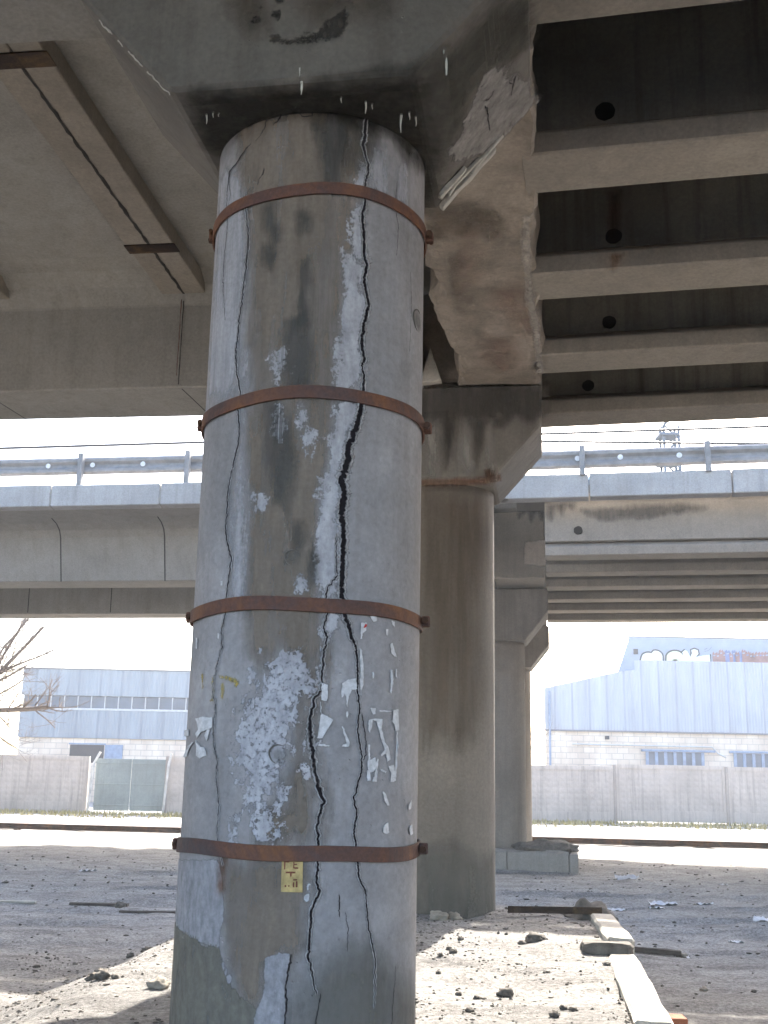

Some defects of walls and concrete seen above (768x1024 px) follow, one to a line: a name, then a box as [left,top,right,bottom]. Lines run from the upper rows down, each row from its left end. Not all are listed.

spalling [439,65,539,211]
leakage [197,8,548,598]
spalling [522,216,542,373]
crack [212,113,313,866]
crack [284,120,396,1024]
leakage [518,503,690,520]
peeling [317,616,397,747]
peeling [367,708,399,806]